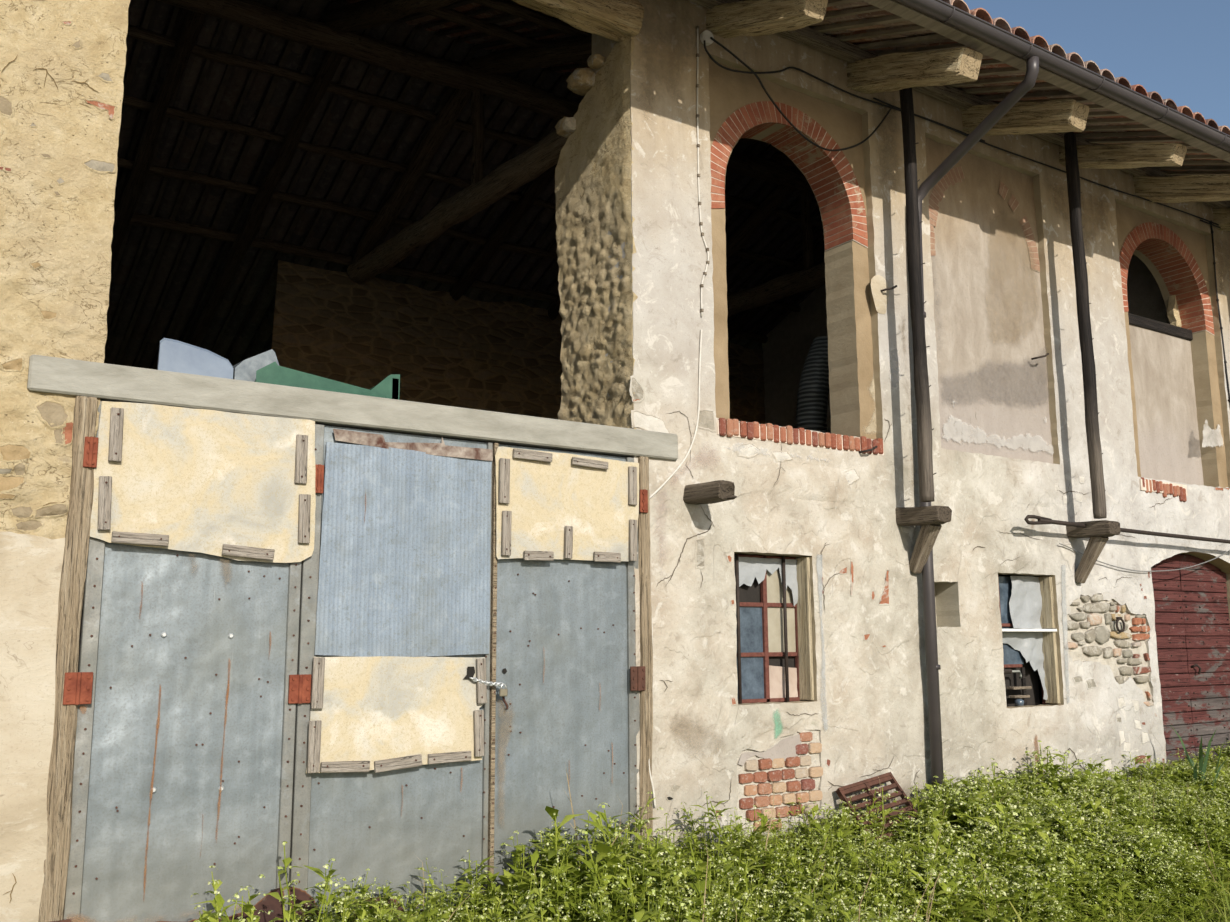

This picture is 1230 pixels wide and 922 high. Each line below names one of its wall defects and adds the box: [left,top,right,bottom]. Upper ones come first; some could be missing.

crack [0,54,99,93]
damp [943,402,1053,454]
crack [656,507,714,587]
spalling [1065,572,1164,765]
spalling [737,730,831,832]
corrosion [189,887,319,922]
corrosion [338,897,407,922]